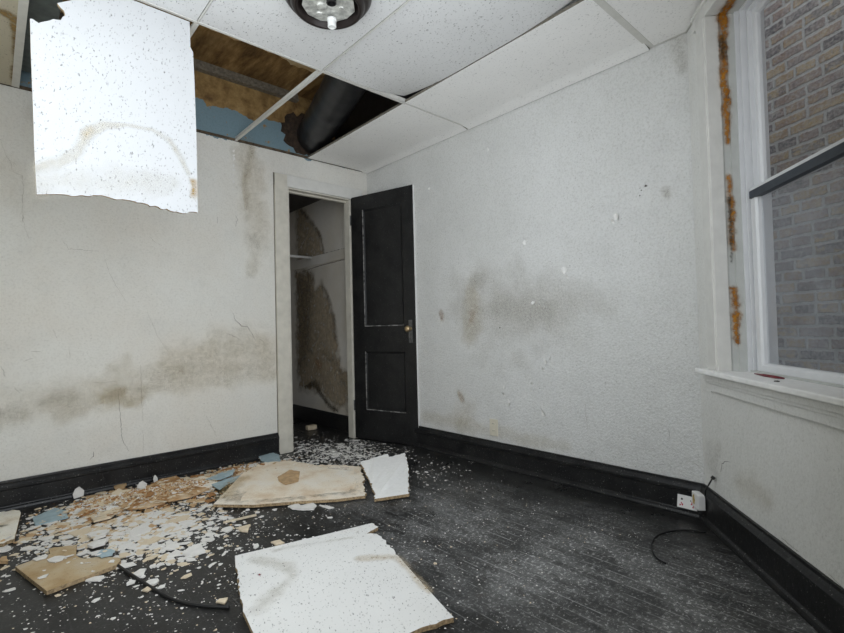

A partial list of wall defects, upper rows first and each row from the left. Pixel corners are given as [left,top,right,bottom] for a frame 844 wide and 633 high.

damp [0,10,17,54]
rust [717,0,736,144]
spalling [281,112,311,156]
rust [726,175,736,262]
rust [730,287,741,344]